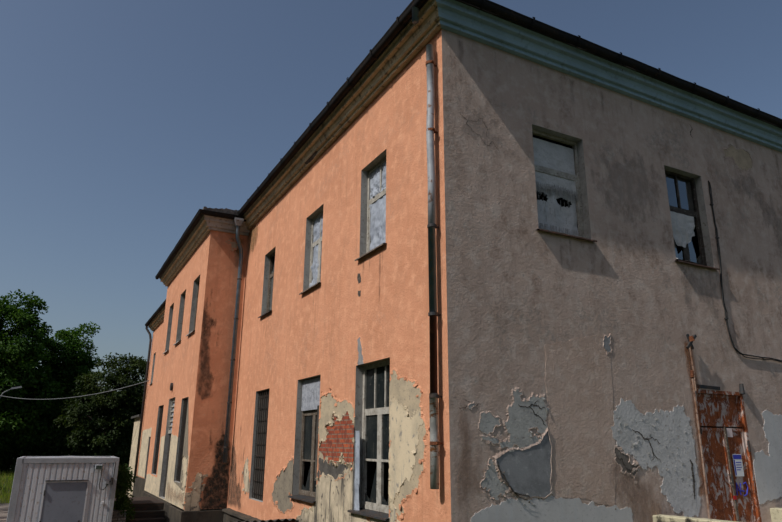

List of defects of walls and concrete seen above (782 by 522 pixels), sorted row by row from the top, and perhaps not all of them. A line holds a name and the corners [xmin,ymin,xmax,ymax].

damp [199,310,213,399]
damp [201,435,244,510]
flaking render [316,387,355,487]
flaking render [389,367,429,522]
peeling [460,387,550,452]
flaking render [479,457,550,507]
flaking render [613,435,641,484]